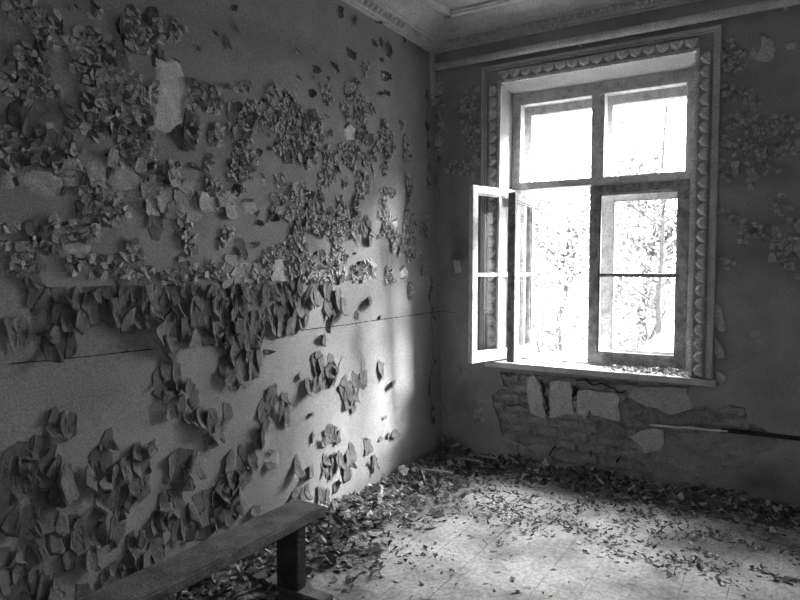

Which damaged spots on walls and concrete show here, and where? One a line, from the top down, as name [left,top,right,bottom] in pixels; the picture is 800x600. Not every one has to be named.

peeling [721,32,776,73]
flaking render [0,0,431,600]
flaking render [481,373,774,490]